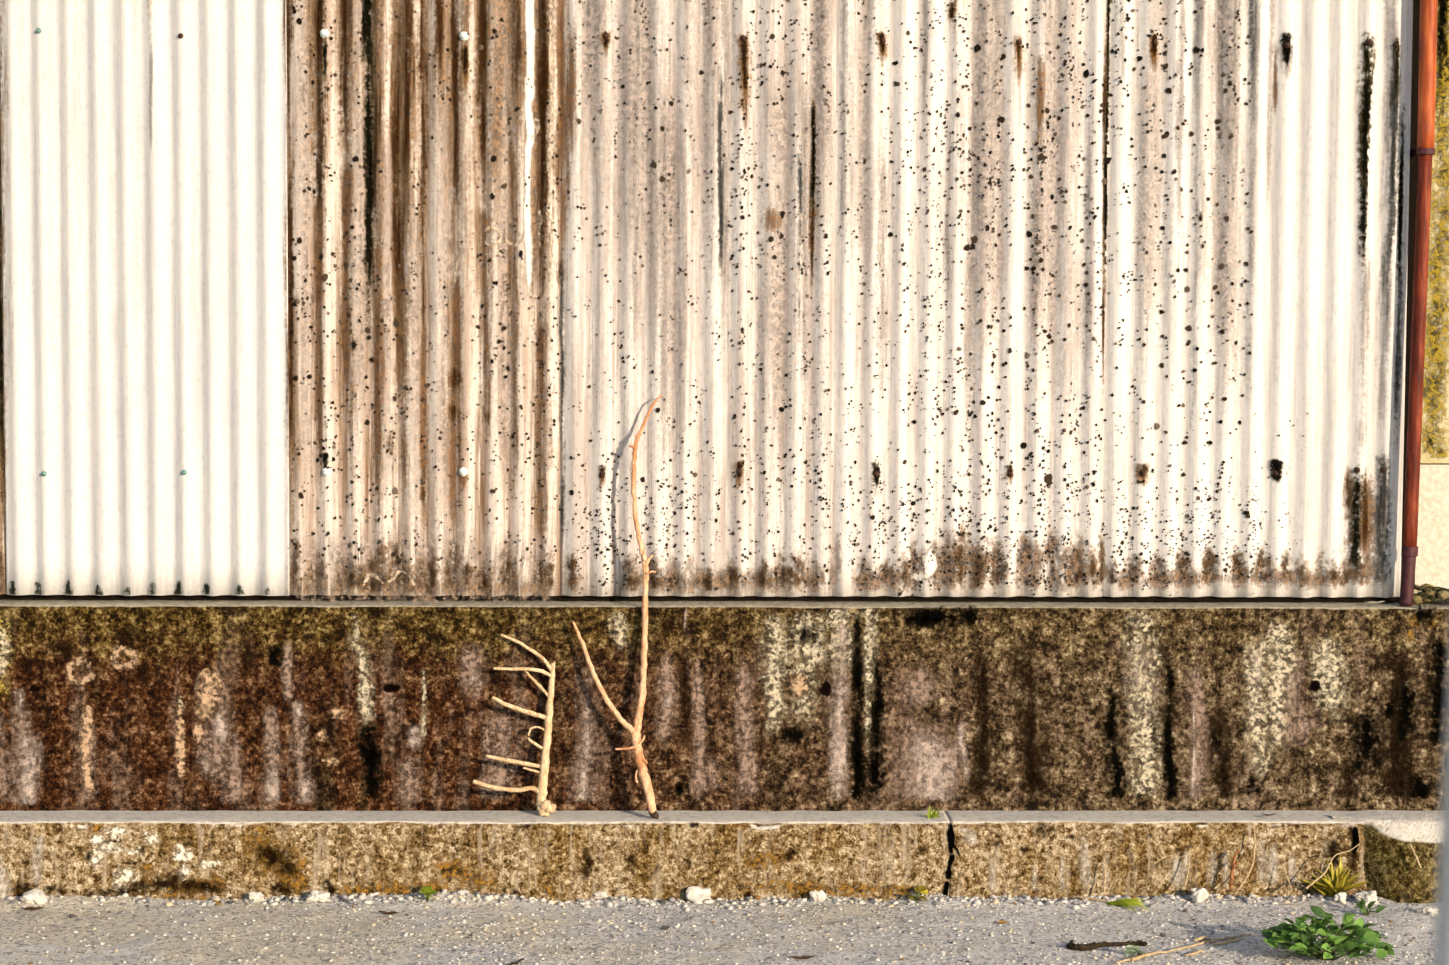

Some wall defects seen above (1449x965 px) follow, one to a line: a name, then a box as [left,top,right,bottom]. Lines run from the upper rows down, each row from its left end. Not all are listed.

rust [460,45,469,89]
leakage [762,0,886,417]
leakage [1032,0,1124,382]
leakage [1357,13,1406,420]
leakage [621,439,1398,632]
leakage [0,620,41,805]
leakage [262,643,314,803]
leakage [657,653,717,799]
leakage [829,618,887,801]
leakage [1162,655,1261,800]
leakage [1337,603,1449,799]
crack [943,823,960,895]